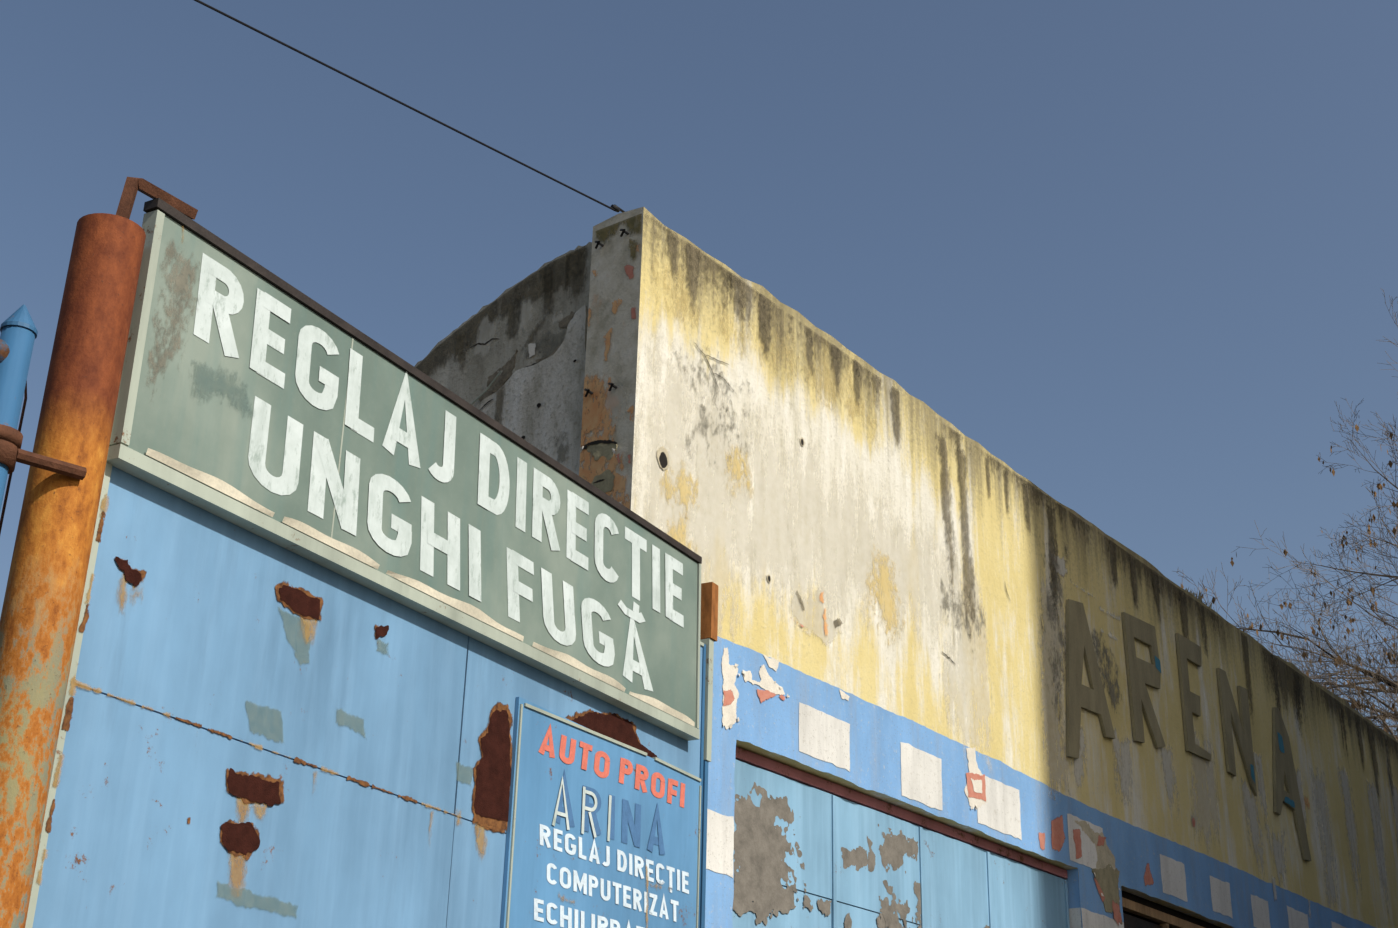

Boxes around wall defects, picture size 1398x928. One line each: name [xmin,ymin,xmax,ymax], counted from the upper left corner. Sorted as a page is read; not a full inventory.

leakage [415,213,793,376]
peeling [579,298,636,509]
leakage [806,327,901,442]
leakage [936,428,984,638]
leakage [986,456,1222,719]
corrosion [37,755,63,884]
corrosion [62,677,232,739]
corrosion [294,757,452,826]
corrosion [472,702,513,833]
peeling [733,782,852,928]
peeling [841,824,921,928]
peeling [1039,815,1123,925]